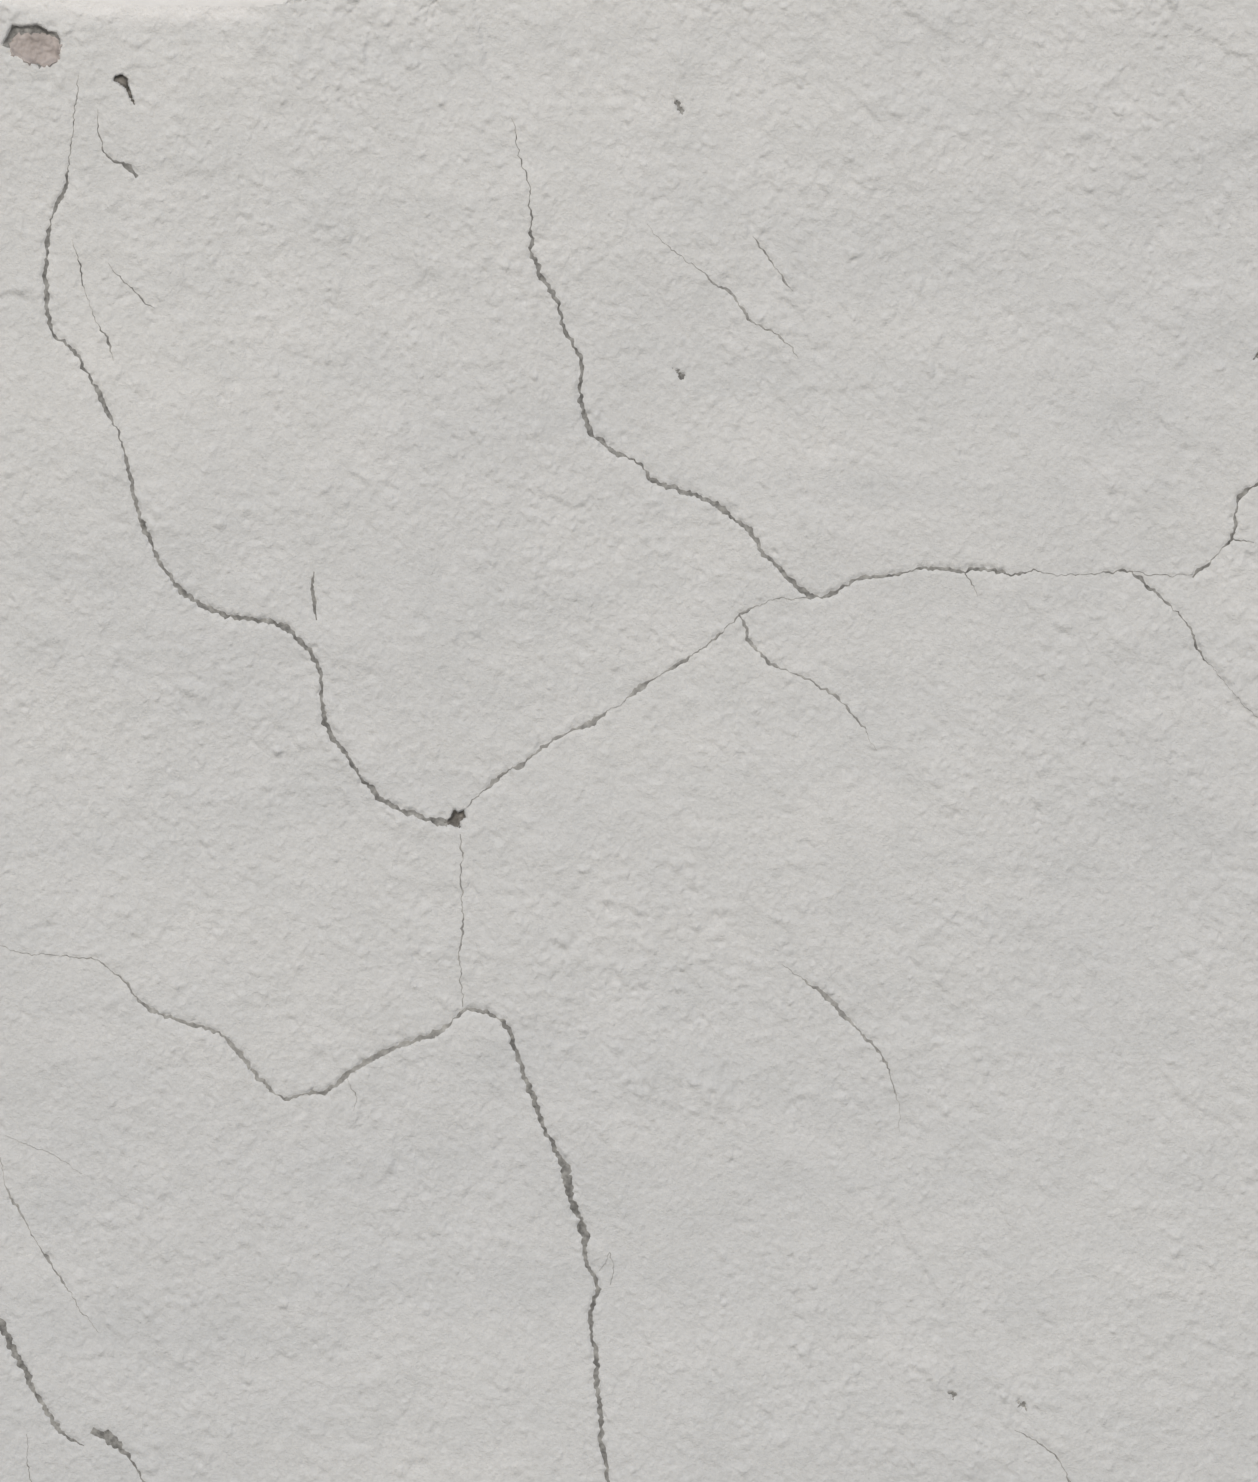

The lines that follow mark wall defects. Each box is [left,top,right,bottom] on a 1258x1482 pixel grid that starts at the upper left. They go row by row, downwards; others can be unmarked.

spalling [2,25,63,69]
crack [511,118,1258,717]
crack [0,80,875,1482]
crack [783,965,901,1132]
crack [1015,1430,1071,1482]